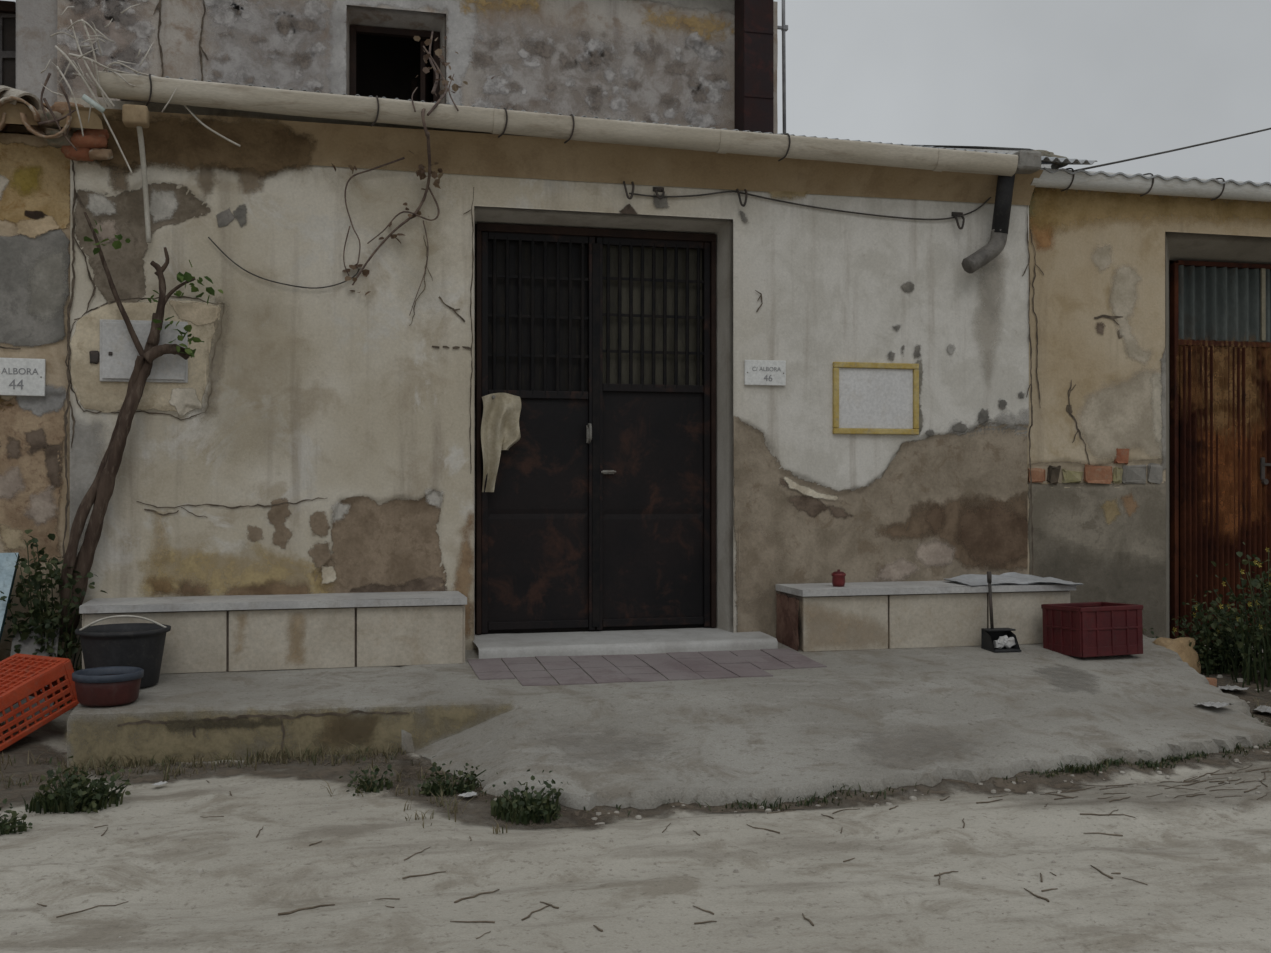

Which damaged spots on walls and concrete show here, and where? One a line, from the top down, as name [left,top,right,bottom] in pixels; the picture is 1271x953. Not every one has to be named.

spalling [0,0,247,304]
spalling [0,397,65,563]
crack [136,497,326,517]
spalling [247,498,292,549]
spalling [308,489,447,594]
spalling [734,345,1166,651]
crack [1022,205,1090,575]
corrosion [1176,345,1271,536]